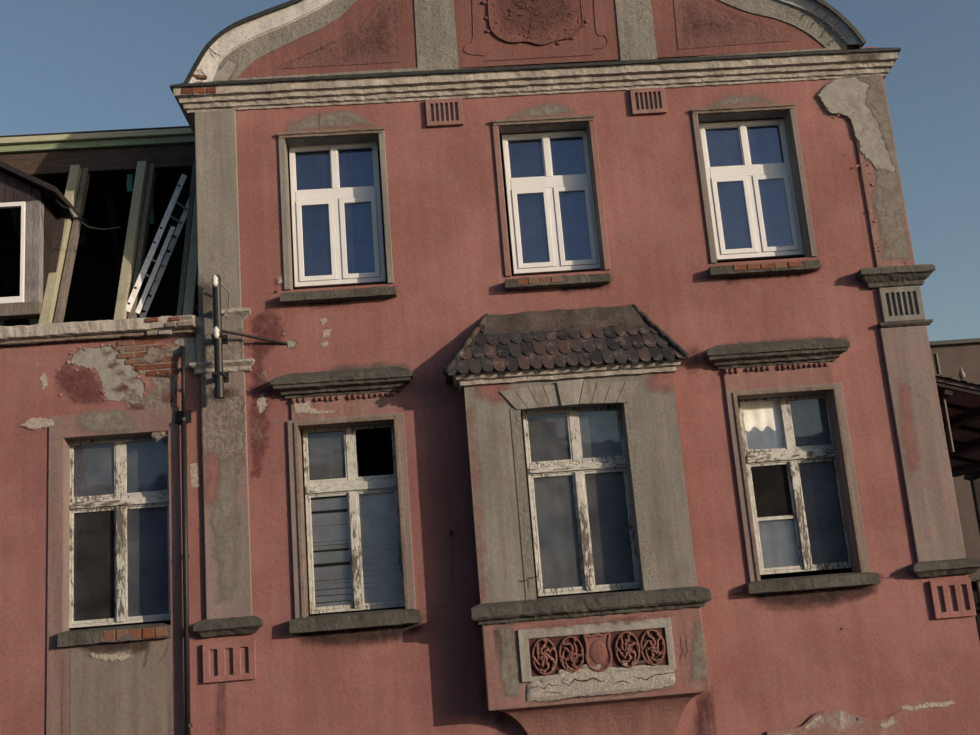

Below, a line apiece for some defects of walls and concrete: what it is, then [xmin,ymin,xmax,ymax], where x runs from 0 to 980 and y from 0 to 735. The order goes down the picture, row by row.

flaking render [818,73,911,263]
peeling [21,418,55,429]
flaking render [39,329,198,410]
flaking render [189,314,288,503]